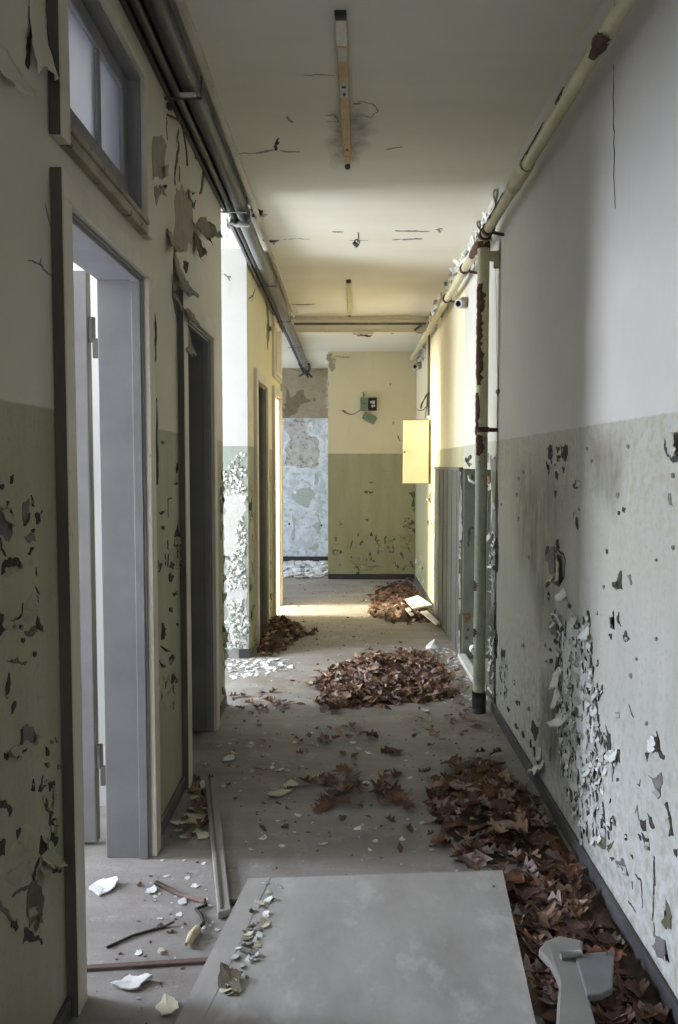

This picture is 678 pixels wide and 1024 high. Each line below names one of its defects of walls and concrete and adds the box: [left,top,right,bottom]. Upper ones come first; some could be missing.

peeling [459,453,674,913]
peeling [652,900,672,962]